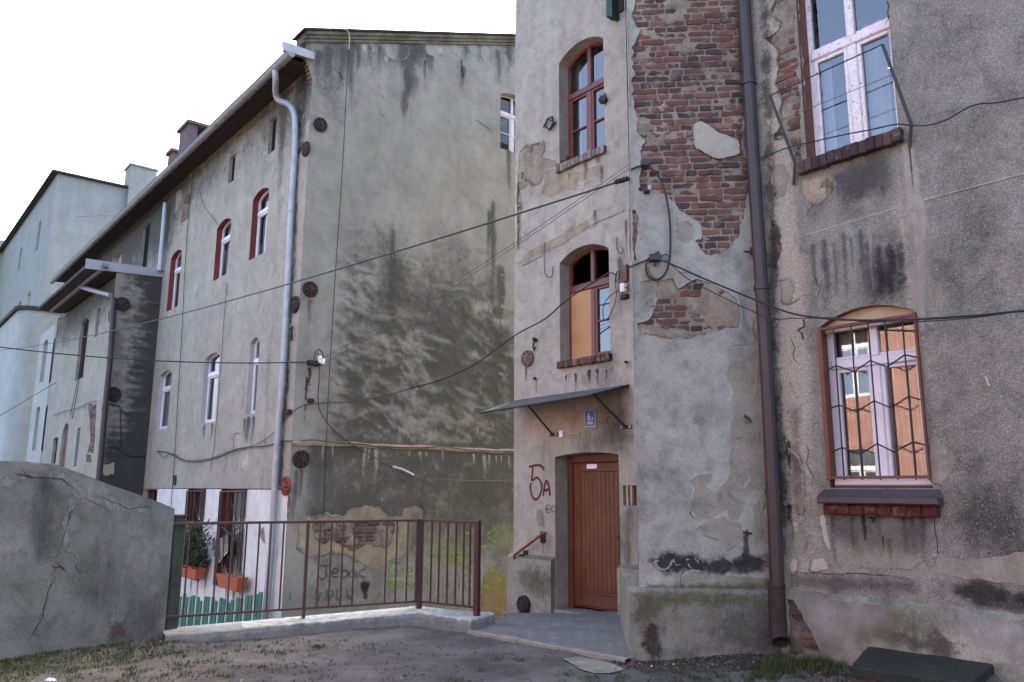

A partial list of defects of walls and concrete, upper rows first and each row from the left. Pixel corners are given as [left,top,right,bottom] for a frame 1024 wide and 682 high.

water stain [399,44,434,107]
flaking render [630,0,749,256]
flaking render [765,0,806,199]
water stain [487,201,505,309]
flaking render [516,141,605,265]
flaking render [636,277,742,340]
water stain [811,232,870,278]
peeling [689,347,760,551]
crack [13,471,154,645]
peeling [296,505,423,569]
water stain [641,623,662,658]
water stain [955,580,1024,603]